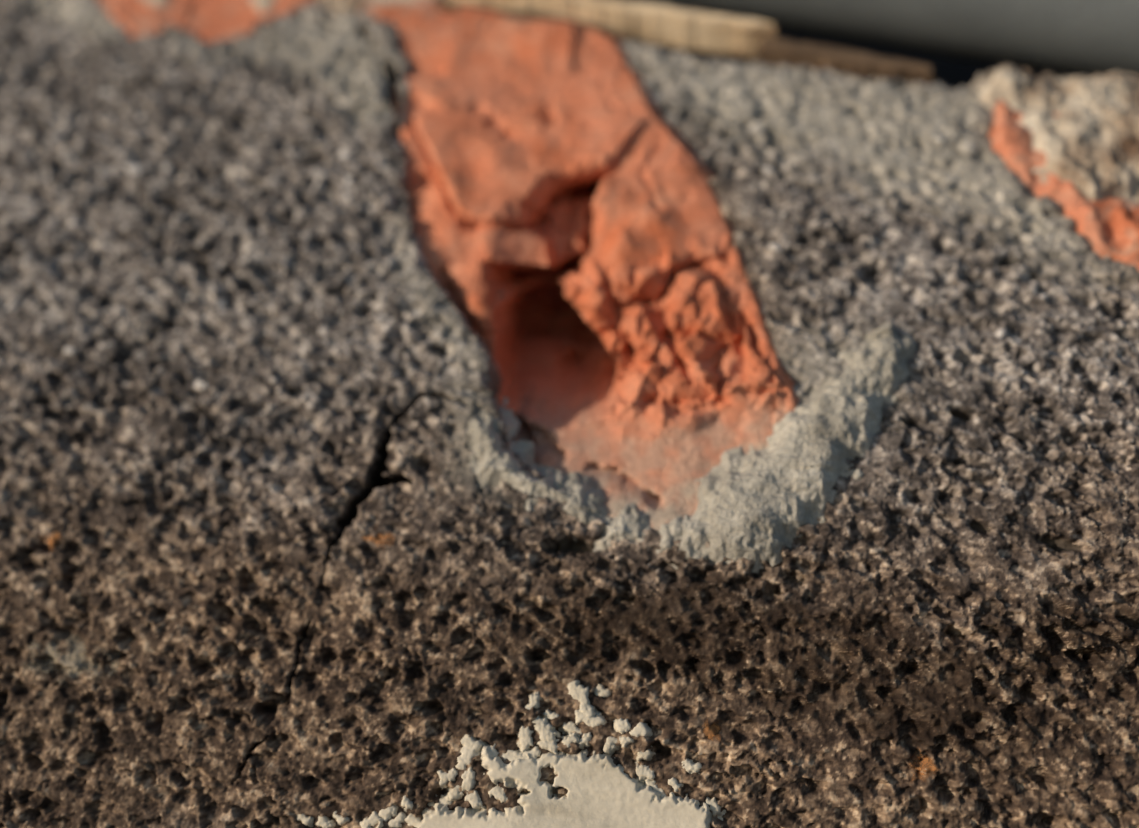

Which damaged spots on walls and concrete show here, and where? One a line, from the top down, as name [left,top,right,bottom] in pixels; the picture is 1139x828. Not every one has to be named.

spalling [970,64,1139,270]
spalling [98,0,917,573]
crack [325,393,465,565]
crack [287,625,310,698]
damp [550,588,609,658]
damp [1043,606,1139,672]
crack [240,740,264,774]